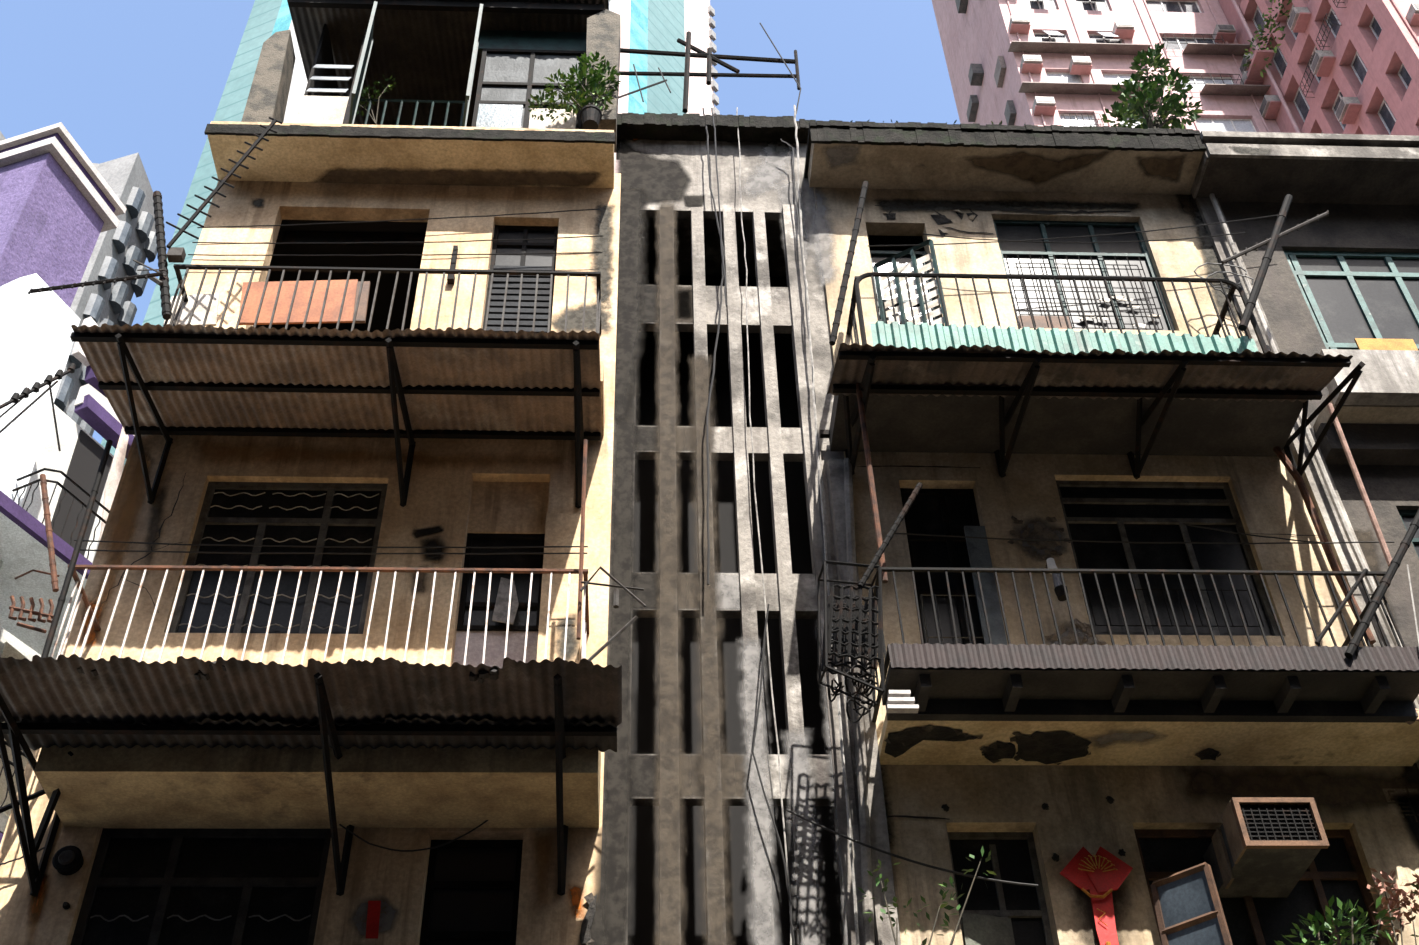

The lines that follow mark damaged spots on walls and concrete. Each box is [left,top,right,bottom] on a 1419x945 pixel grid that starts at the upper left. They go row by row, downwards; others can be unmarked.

leakage [314,168,599,187]
leakage [874,150,1139,212]
leakage [1137,156,1185,181]
leakage [744,142,834,283]
leakage [413,526,443,538]
leakage [550,139,777,945]
leakage [412,567,427,593]
spalling [884,725,1159,765]
spalling [1195,748,1221,761]
leakage [881,767,893,846]
leakage [787,733,823,945]
leakage [831,762,849,945]